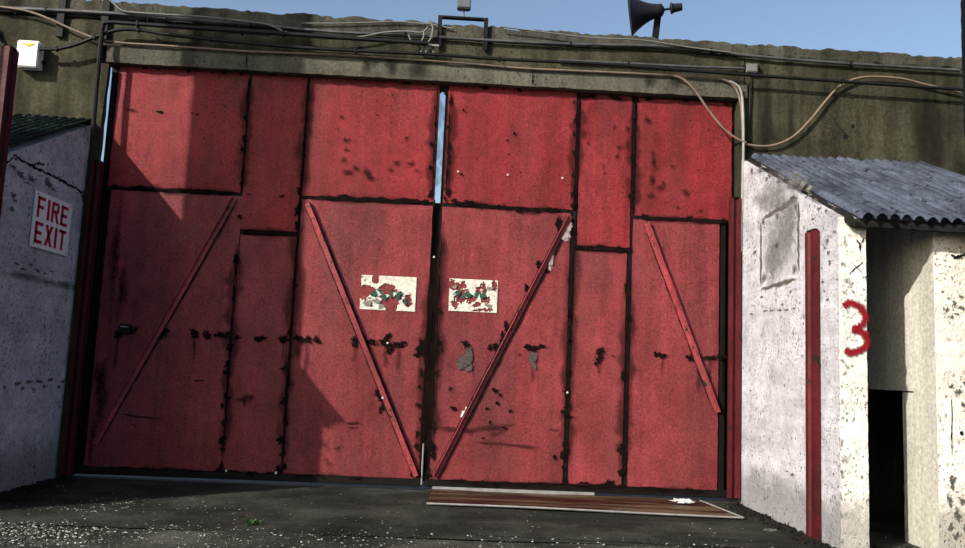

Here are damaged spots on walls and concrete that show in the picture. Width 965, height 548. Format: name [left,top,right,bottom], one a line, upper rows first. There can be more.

crack [7,154,85,198]